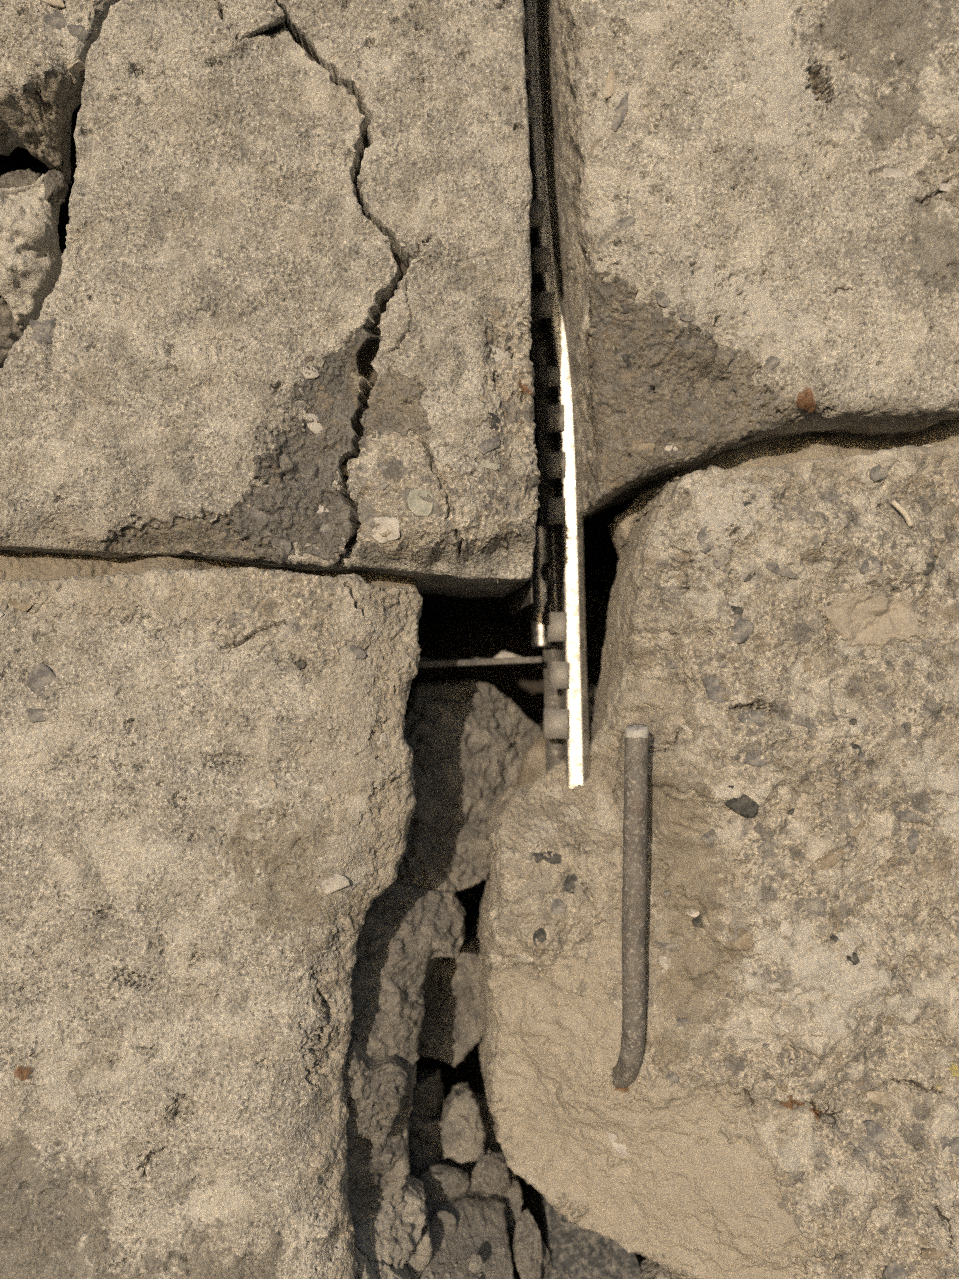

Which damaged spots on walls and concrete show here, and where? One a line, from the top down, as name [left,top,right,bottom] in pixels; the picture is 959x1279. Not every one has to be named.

crack [254,22,337,85]
crack [353,103,369,216]
crack [340,238,431,613]
crack [426,446,464,551]
spalling [0,297,541,1279]
crack [858,1078,942,1096]